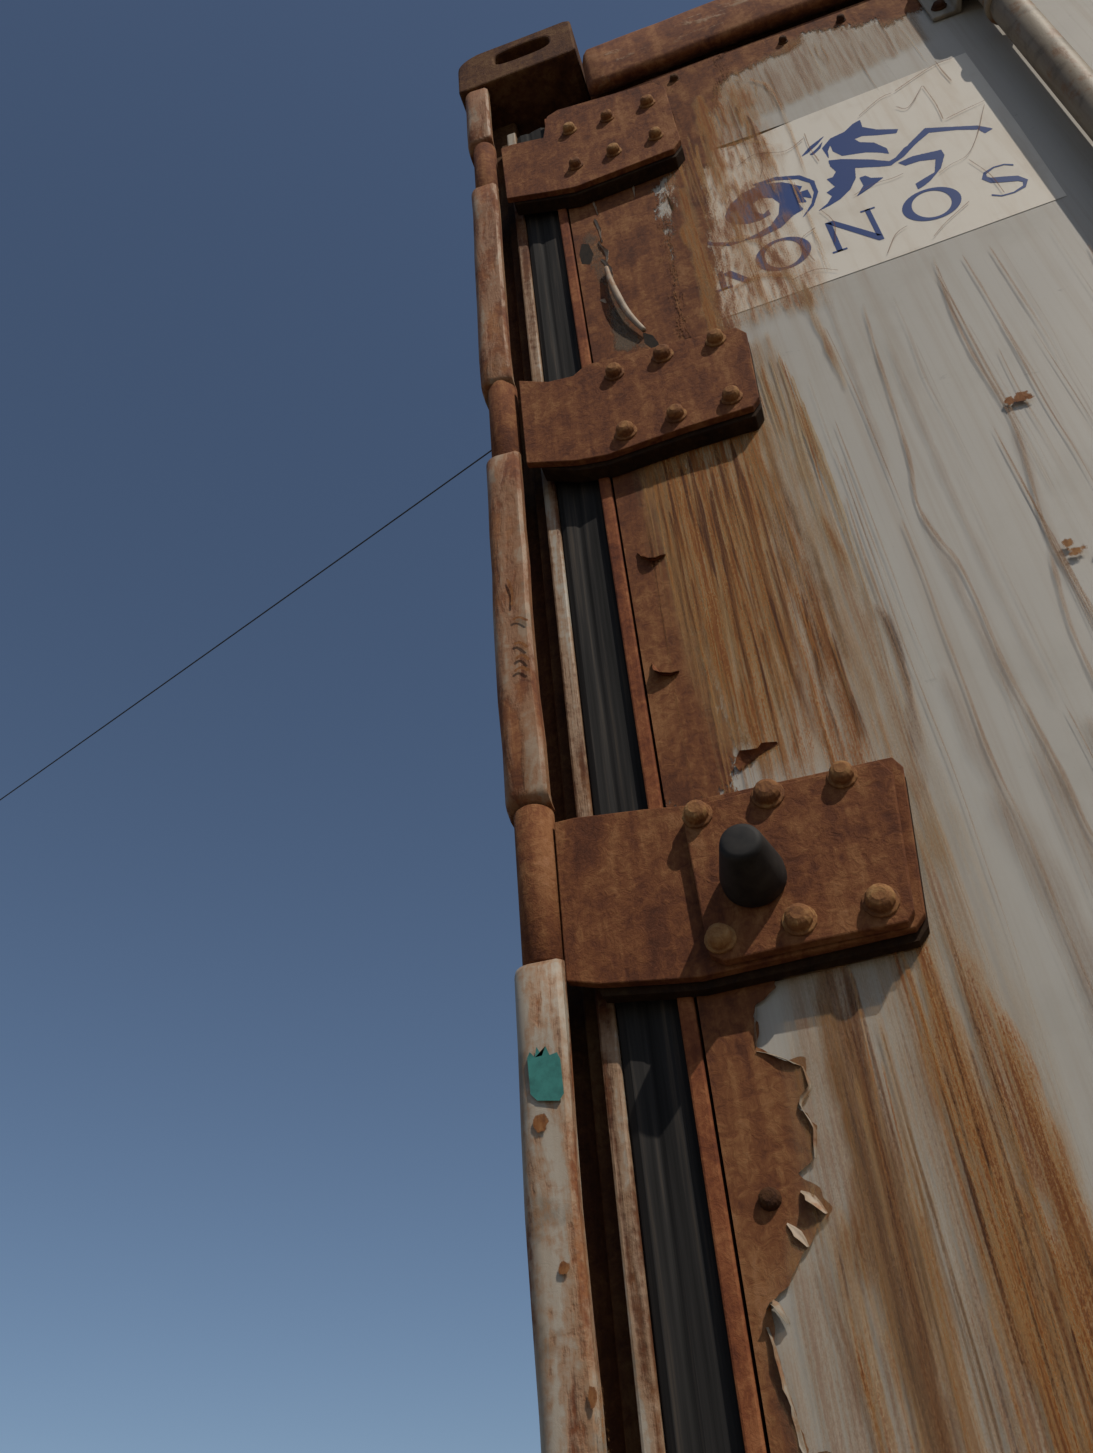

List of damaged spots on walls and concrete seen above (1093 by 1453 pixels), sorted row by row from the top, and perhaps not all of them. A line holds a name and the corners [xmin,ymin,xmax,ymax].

rust [645,51,839,368]
rust [643,347,940,843]
rust [1061,538,1086,556]
rust [533,1113,549,1133]
rust [558,1261,570,1275]
peeling [697,981,832,1453]
rust [817,858,1093,1453]